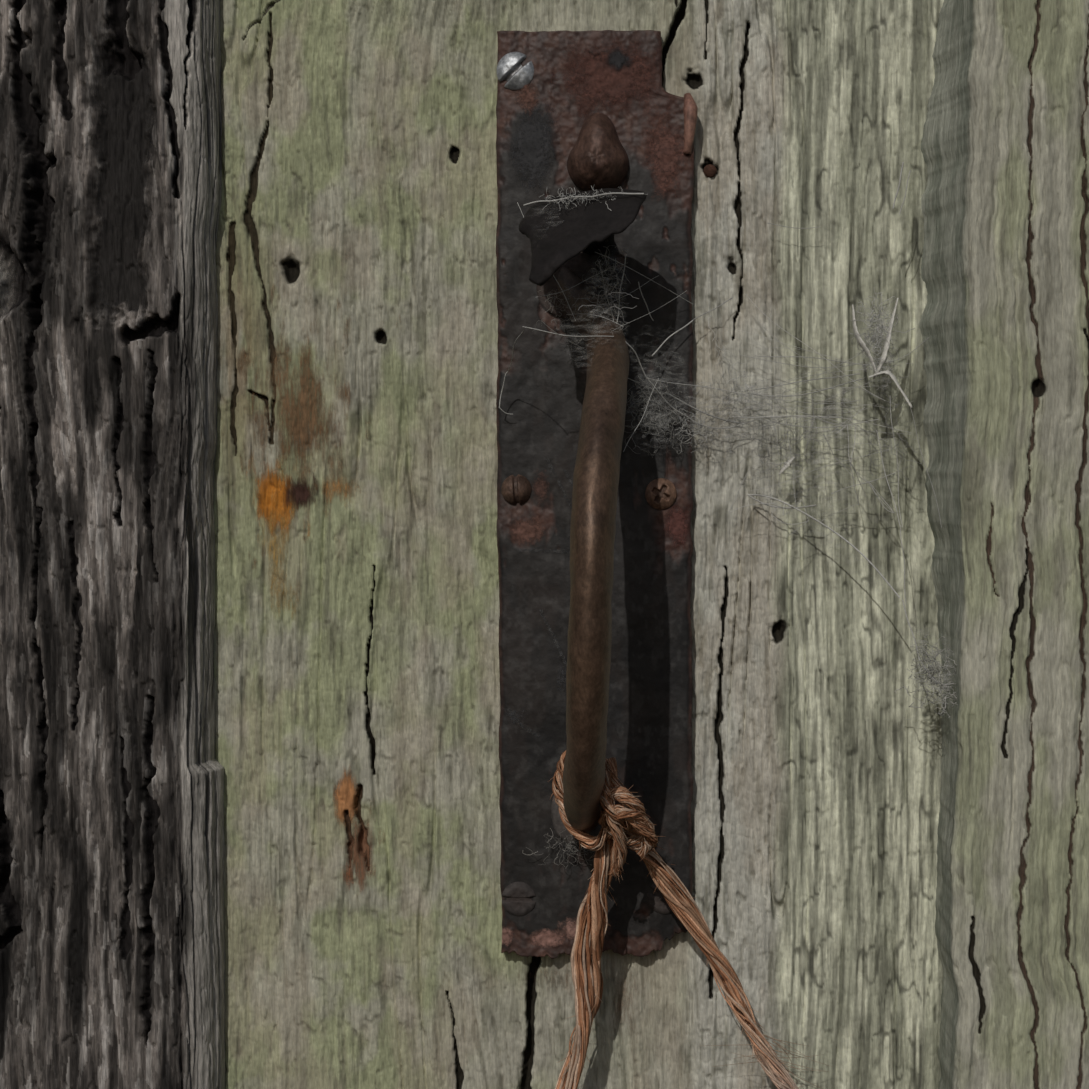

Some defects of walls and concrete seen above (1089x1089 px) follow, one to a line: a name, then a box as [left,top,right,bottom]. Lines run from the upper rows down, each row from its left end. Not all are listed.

crack [662,0,708,84]
crack [226,13,276,456]
crack [732,23,750,340]
corrosion [249,342,350,597]
corrosion [335,772,372,886]
crack [364,565,376,775]
crack [520,956,541,1089]
corrosion [531,919,577,947]
crack [712,566,728,938]
crack [968,916,986,1034]
crack [986,0,1044,1089]
crack [1064,14,1089,1089]